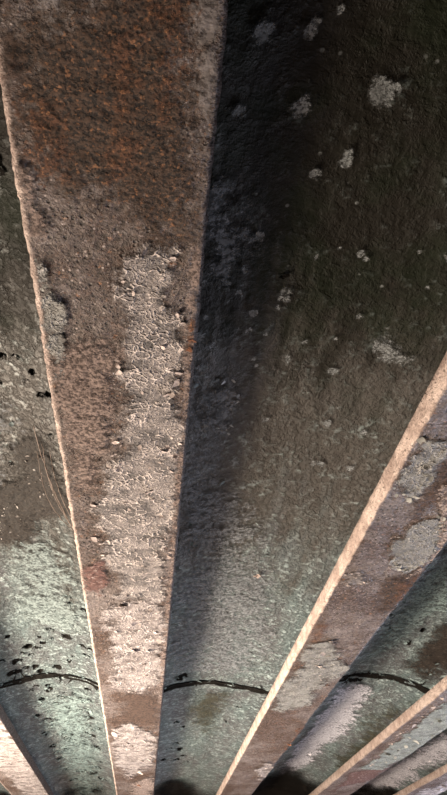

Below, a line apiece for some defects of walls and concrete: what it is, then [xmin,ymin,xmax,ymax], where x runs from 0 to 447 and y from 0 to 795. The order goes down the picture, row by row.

rust [0,0,209,253]
peeling [393,437,447,503]
leakage [0,433,88,636]
peeling [388,516,446,574]
crack [0,673,99,690]
crack [163,679,269,696]
crack [339,671,429,694]
leakage [252,684,373,795]